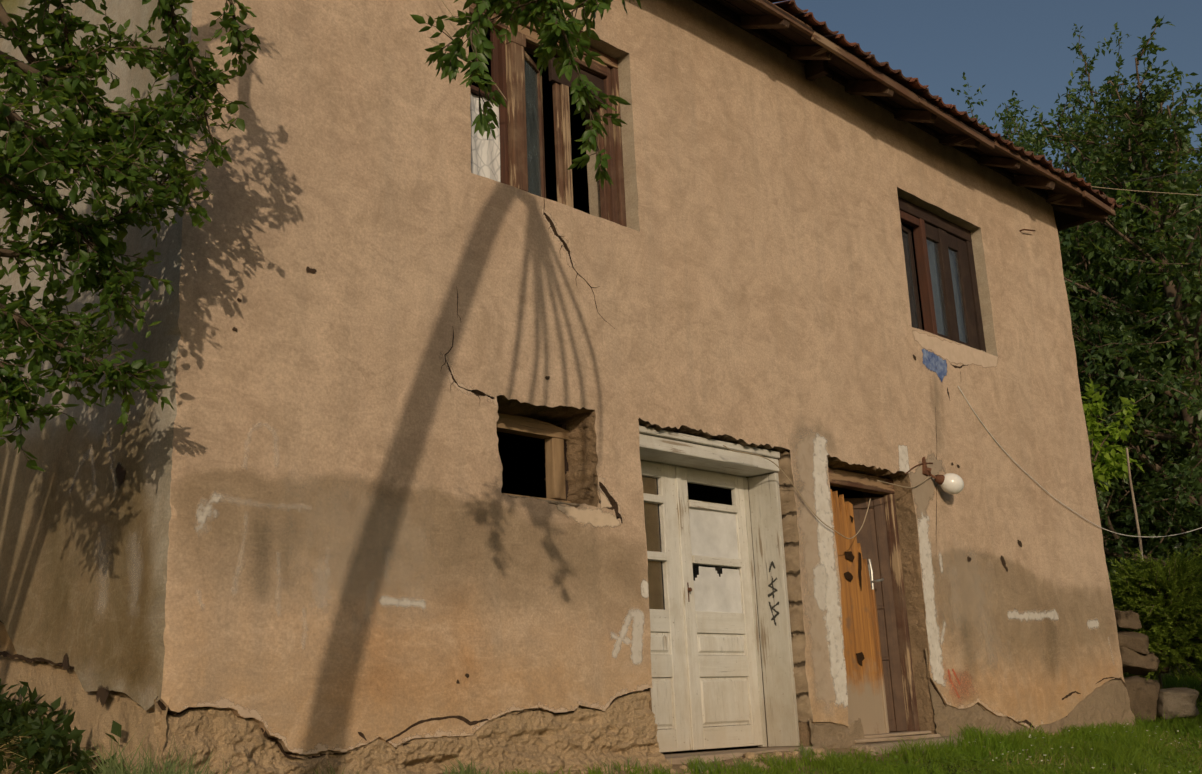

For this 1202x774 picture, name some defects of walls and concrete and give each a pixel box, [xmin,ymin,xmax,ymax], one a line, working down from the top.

crack [540,200,615,329]
crack [440,286,498,405]
crack [598,477,626,523]
spalling [0,622,670,774]
spalling [925,648,1136,737]